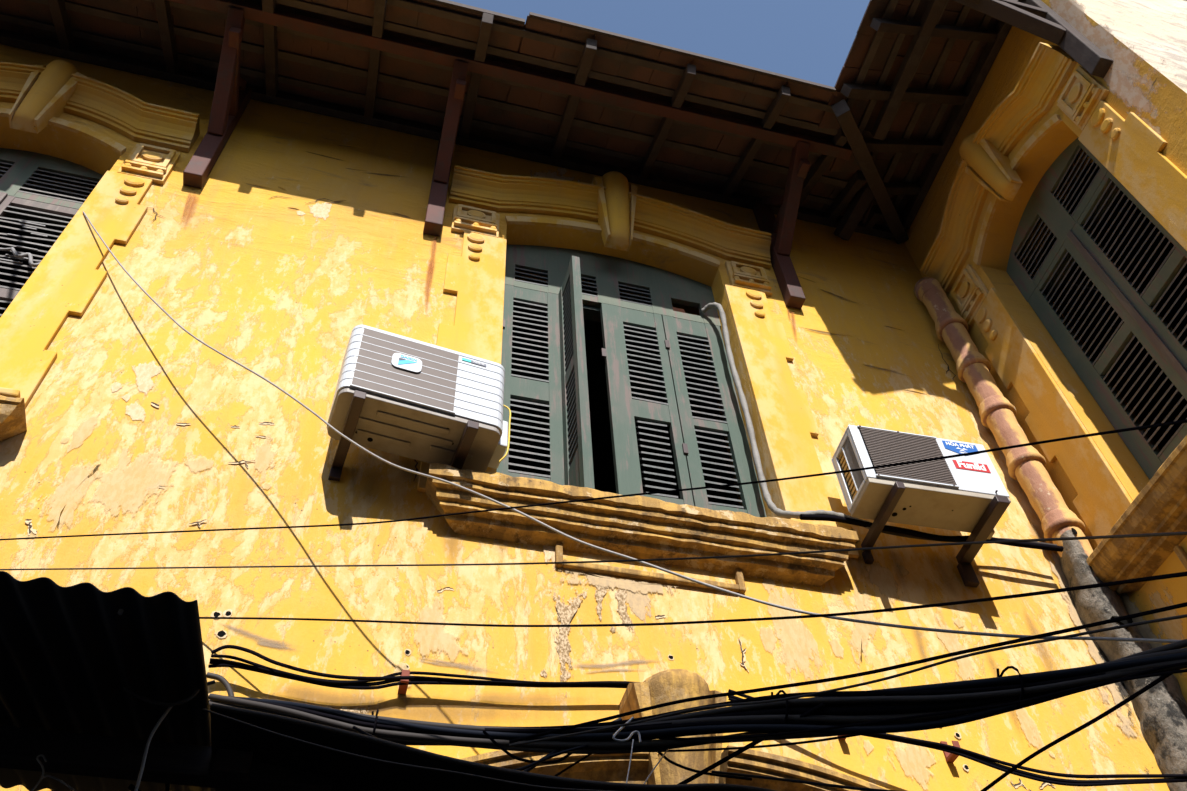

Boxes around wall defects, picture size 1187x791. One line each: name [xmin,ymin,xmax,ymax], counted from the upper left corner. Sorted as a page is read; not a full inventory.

peeling [1050,0,1161,136]
peeling [111,361,162,421]
peeling [40,447,213,531]
spalling [541,545,678,697]